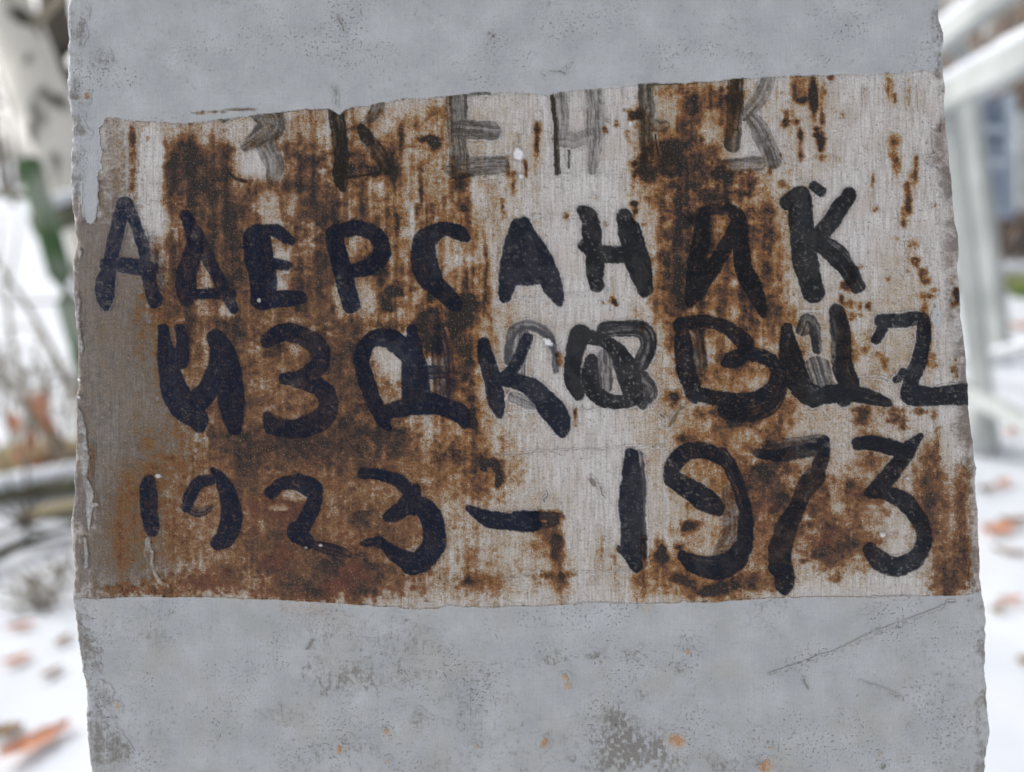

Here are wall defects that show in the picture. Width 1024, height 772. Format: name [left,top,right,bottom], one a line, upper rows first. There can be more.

corrosion [72,73,982,610]